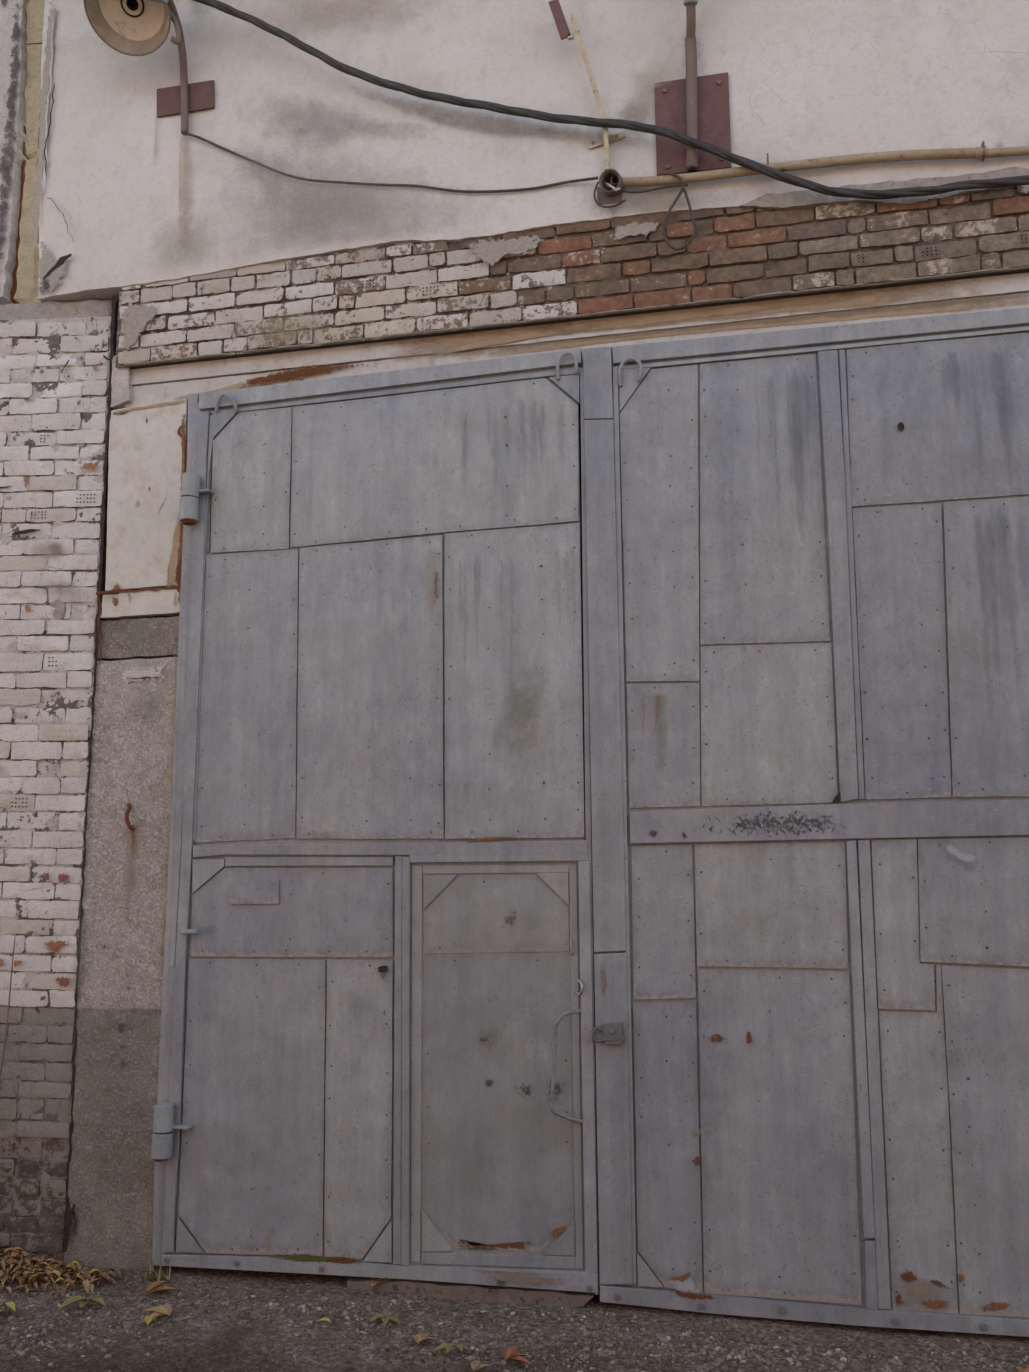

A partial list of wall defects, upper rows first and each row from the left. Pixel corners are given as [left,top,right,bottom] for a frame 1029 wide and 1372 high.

flaking render [32,2,73,296]
peeling [610,220,660,240]
peeling [44,939,69,953]
corrosion [458,1239,531,1250]
corrosion [895,1271,964,1309]
corrosion [984,1302,1008,1311]